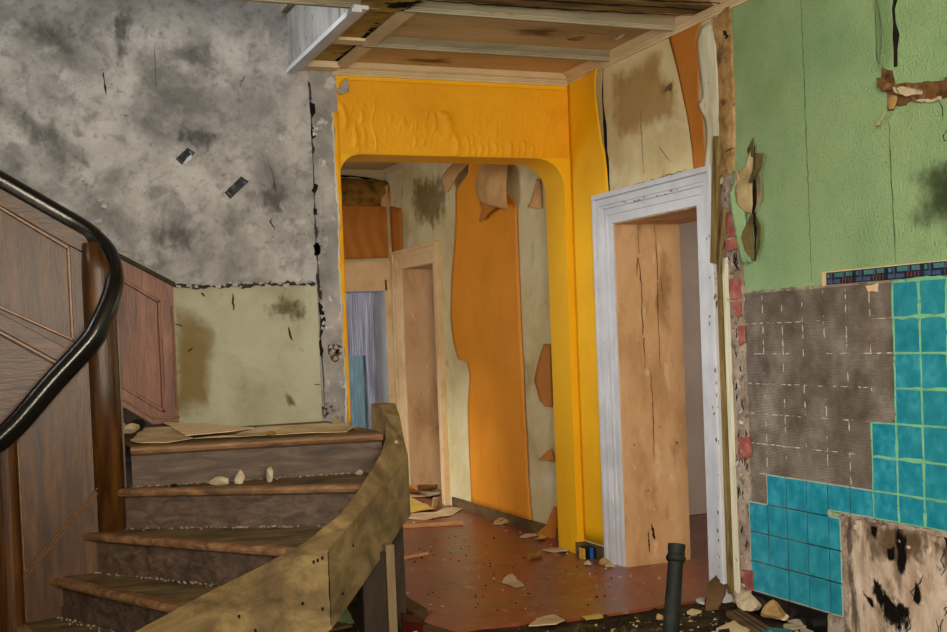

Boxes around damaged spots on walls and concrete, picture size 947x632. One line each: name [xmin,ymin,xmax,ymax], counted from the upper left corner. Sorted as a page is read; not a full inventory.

peeling [313,0,422,61]
spalling [875,68,947,127]
mould [925,170,947,215]
spalling [322,112,347,424]
damp [277,301,304,318]
peeling [709,6,896,594]
damp [179,322,209,404]